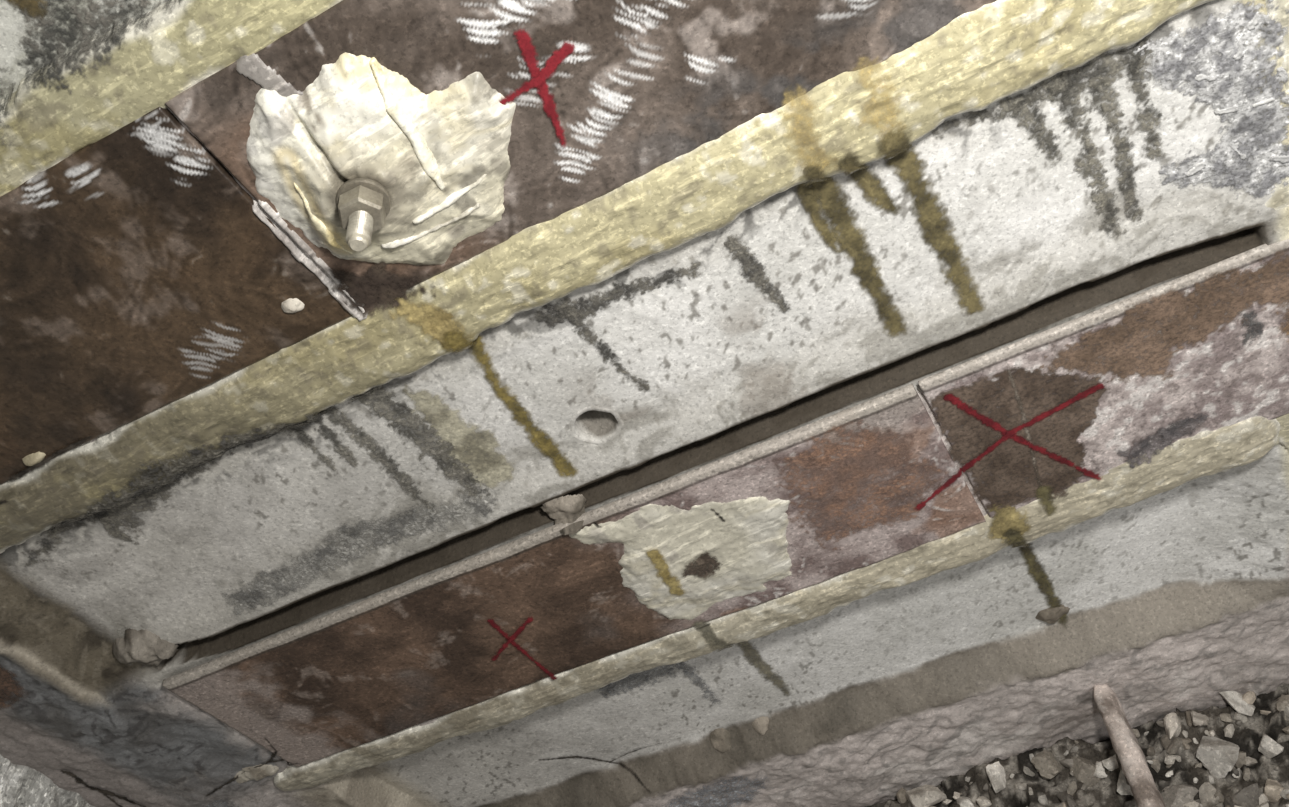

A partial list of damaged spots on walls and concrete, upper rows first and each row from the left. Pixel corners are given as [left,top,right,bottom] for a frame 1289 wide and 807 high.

damp [932,36,1165,237]
damp [790,68,983,336]
damp [390,298,577,476]
damp [1036,486,1056,515]
damp [989,505,1067,624]
rust [0,665,23,708]
crack [61,770,146,807]
crack [540,743,659,792]